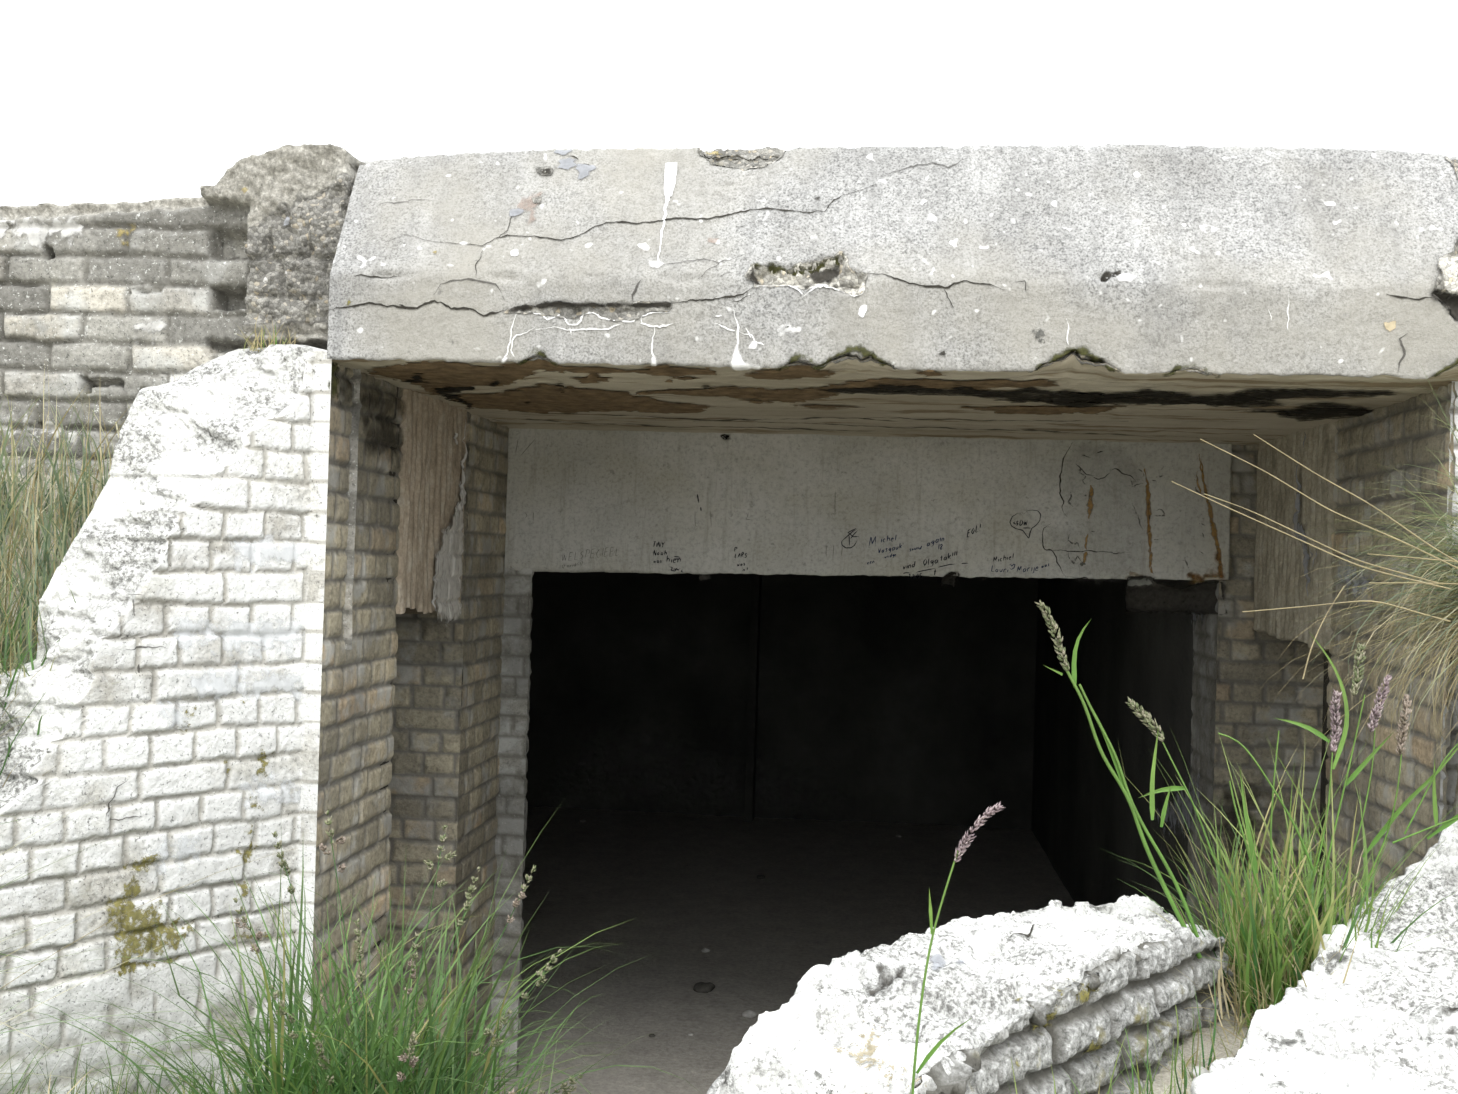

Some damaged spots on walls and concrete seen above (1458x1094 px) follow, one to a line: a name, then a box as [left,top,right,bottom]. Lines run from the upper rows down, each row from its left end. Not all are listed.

spalling [697,146,802,171]
spalling [244,173,355,328]
crack [327,158,966,317]
spalling [745,251,868,297]
crack [863,272,1026,308]
spalling [1432,241,1458,320]
damp [502,315,620,363]
damp [641,317,657,366]
damp [716,309,764,371]
rust [1080,485,1094,566]
rust [1132,469,1153,575]
rust [1188,454,1224,582]